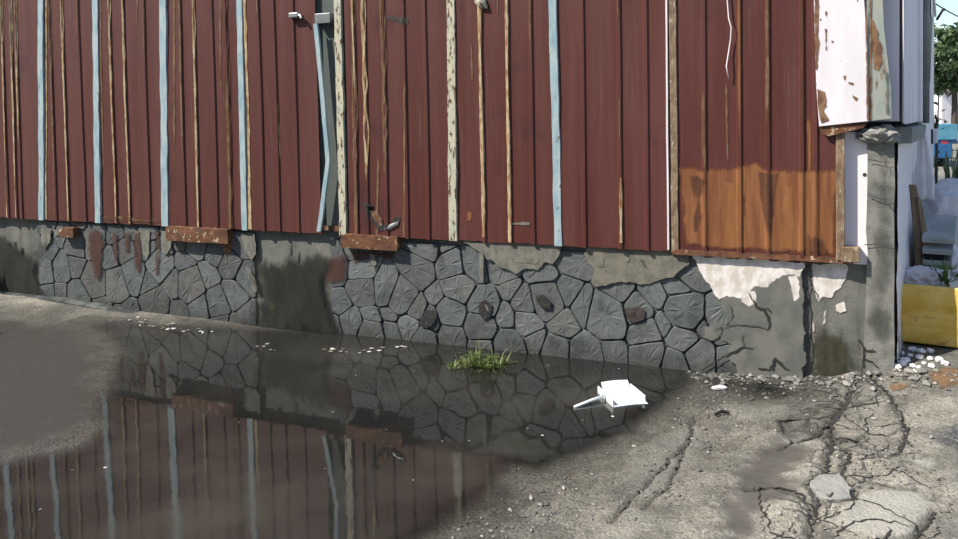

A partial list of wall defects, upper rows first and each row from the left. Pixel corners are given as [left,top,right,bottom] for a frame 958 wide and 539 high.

rust [221,0,233,229]
rust [679,0,836,255]
rust [843,0,889,121]
water stain [255,244,338,333]
flaking render [584,177,848,378]
crack [702,263,941,539]